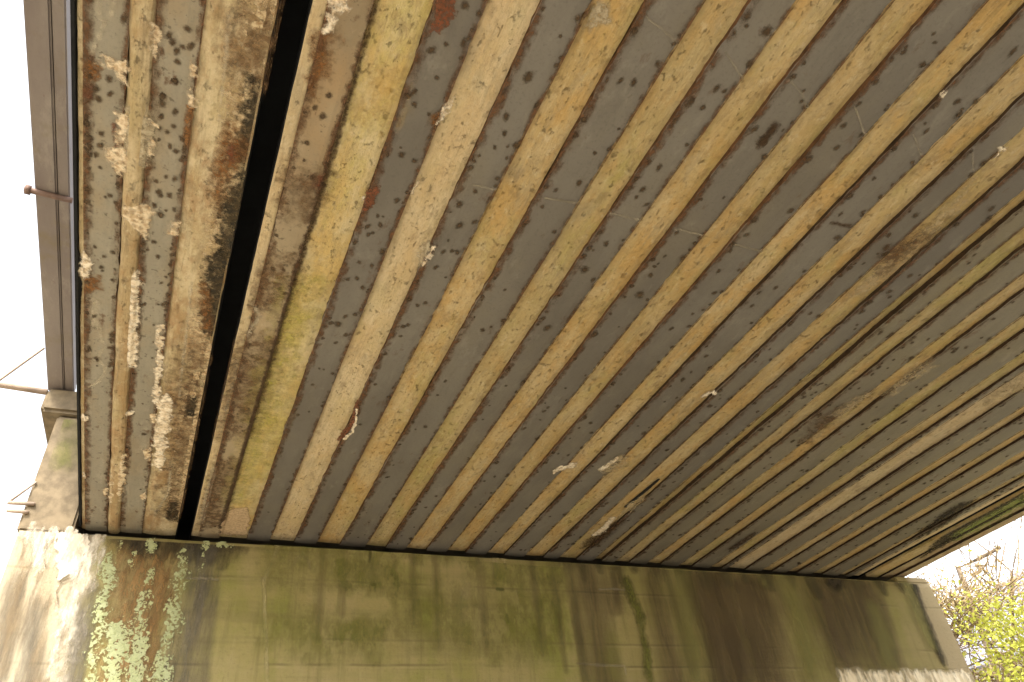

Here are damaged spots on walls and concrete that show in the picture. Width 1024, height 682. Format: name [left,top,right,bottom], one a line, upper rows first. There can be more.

corrosion [81,0,213,528]
corrosion [199,0,380,533]
corrosion [249,0,591,539]
corrosion [343,0,794,546]
water stain [118,539,242,682]